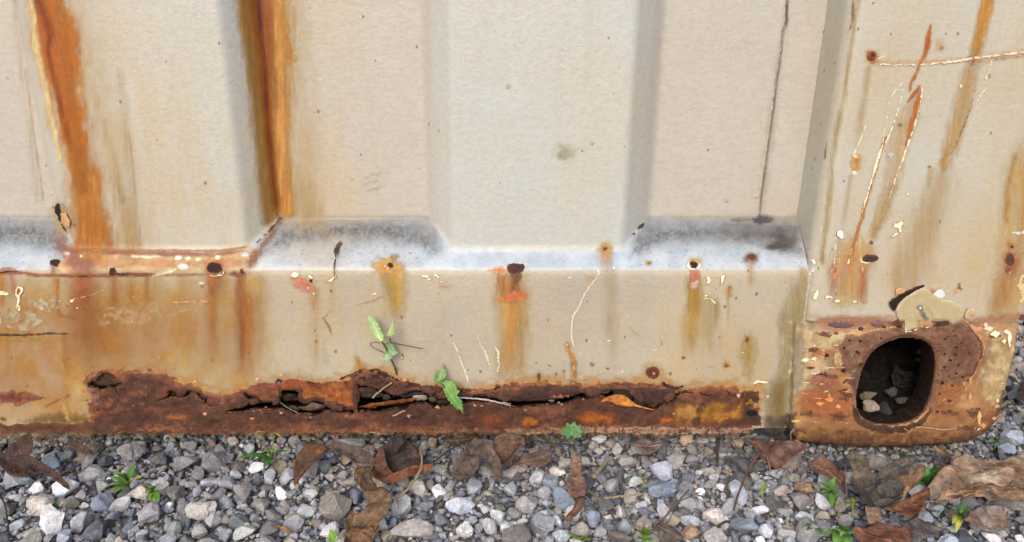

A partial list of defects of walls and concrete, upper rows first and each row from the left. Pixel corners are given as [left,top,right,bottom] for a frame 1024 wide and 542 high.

corrosion [0,0,764,437]
corrosion [785,150,1024,447]
peeling [889,283,976,332]
corrosion [928,0,994,169]